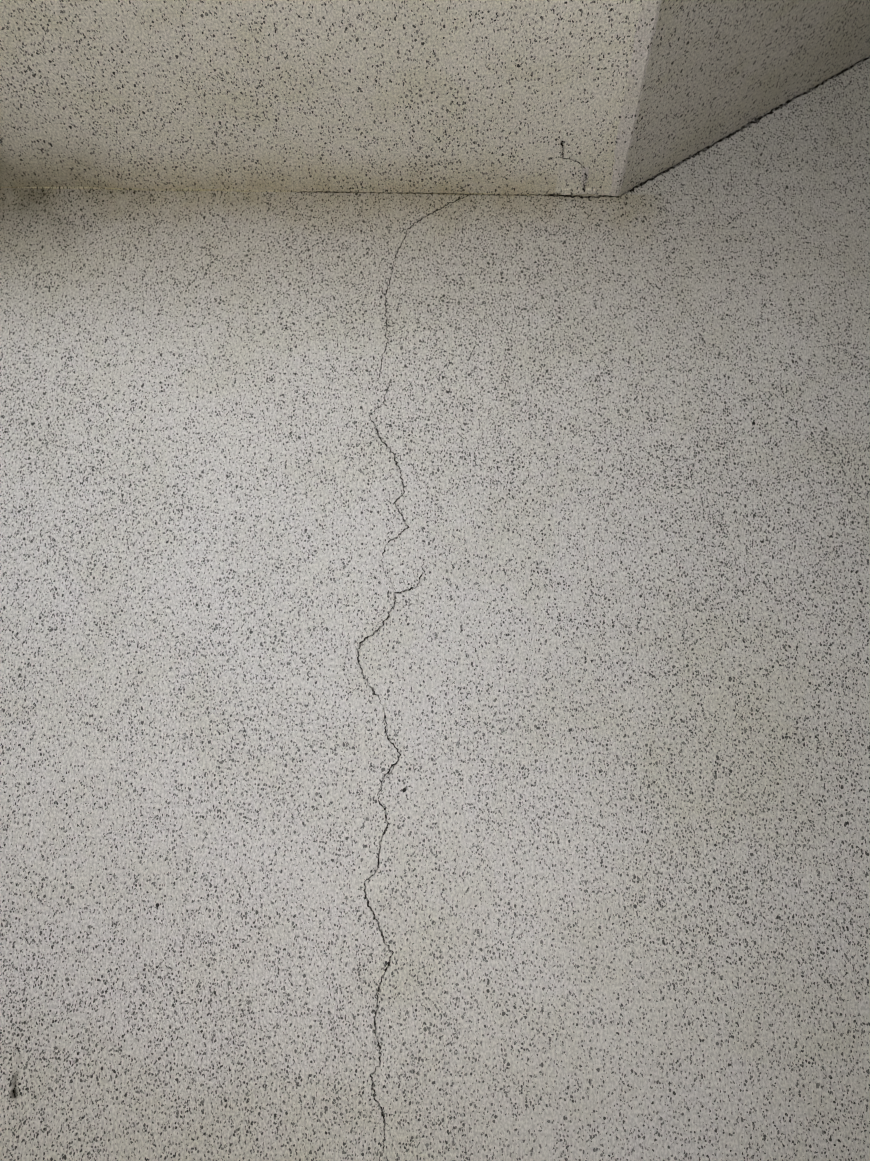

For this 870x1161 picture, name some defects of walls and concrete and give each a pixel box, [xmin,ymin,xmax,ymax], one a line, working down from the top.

crack [291,55,870,1161]